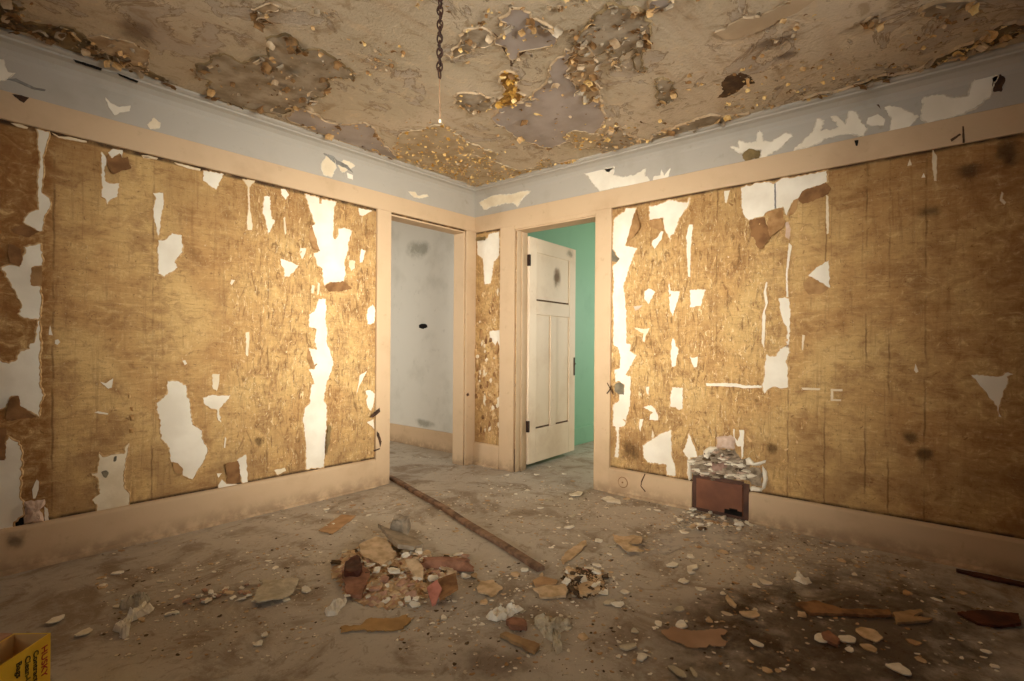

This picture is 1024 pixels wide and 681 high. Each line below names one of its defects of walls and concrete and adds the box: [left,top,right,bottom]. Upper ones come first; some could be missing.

peeling [0,0,177,90]
peeling [190,0,1024,210]
peeling [152,192,184,278]
peeling [242,179,275,234]
peeling [476,231,500,285]
peeling [740,169,831,249]
peeling [0,129,52,529]
peeling [301,193,353,470]
peeling [607,196,768,492]
peeling [761,243,792,394]
peeling [90,442,131,511]
peeling [155,373,231,480]